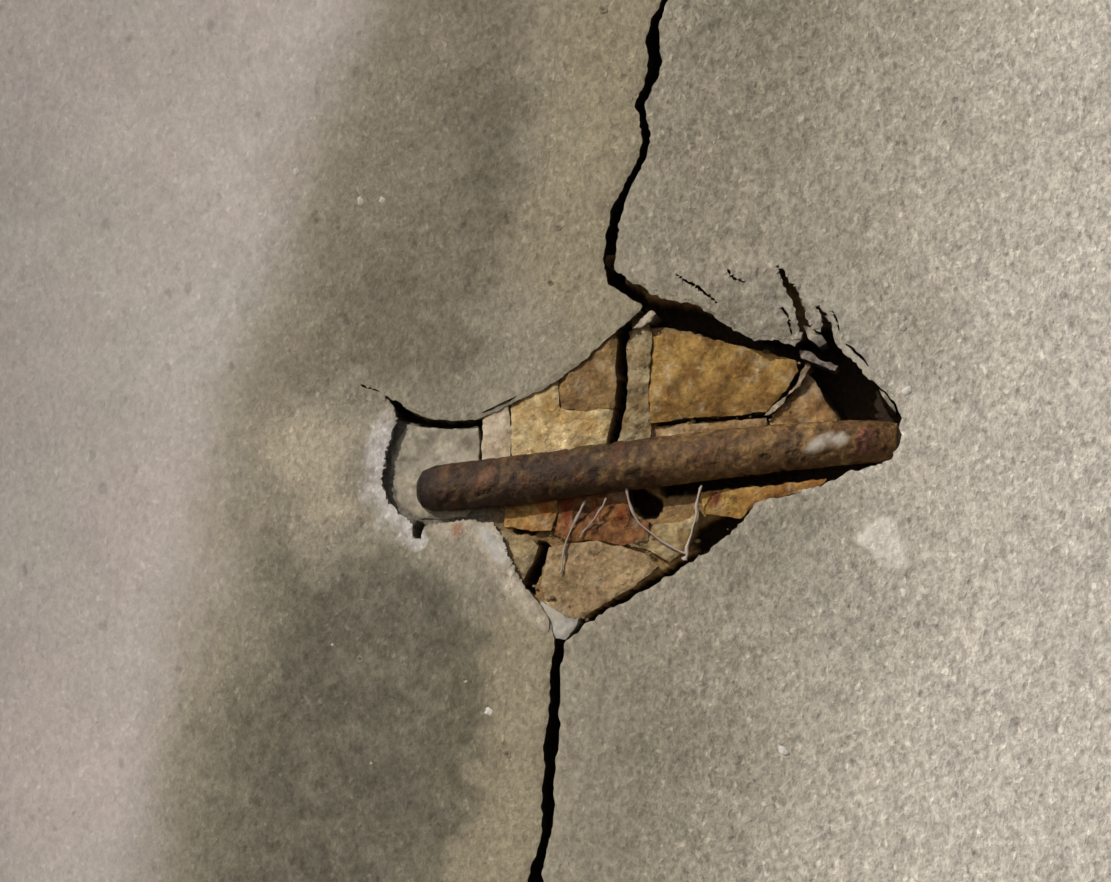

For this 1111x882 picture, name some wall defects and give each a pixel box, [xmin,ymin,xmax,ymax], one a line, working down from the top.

crack [603,0,668,277]
damp [103,0,559,882]
spalling [382,255,902,654]
peeling [855,515,914,575]
crack [528,638,570,882]